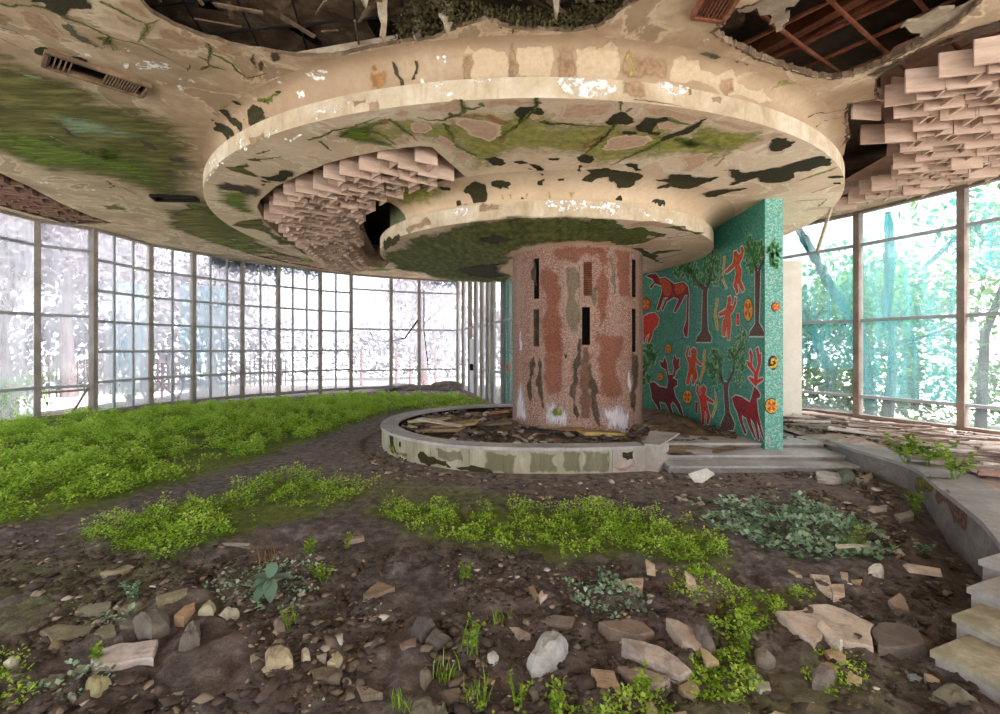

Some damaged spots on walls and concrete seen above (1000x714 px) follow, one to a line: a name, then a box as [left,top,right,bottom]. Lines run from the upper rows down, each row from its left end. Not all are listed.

peeling [361,0,388,42]
peeling [438,0,455,37]
peeling [462,43,555,83]
peeling [575,41,621,80]
spalling [670,0,989,145]
spalling [485,157,560,186]
spalling [652,153,843,206]
leakage [406,218,431,234]
leakage [516,339,638,432]